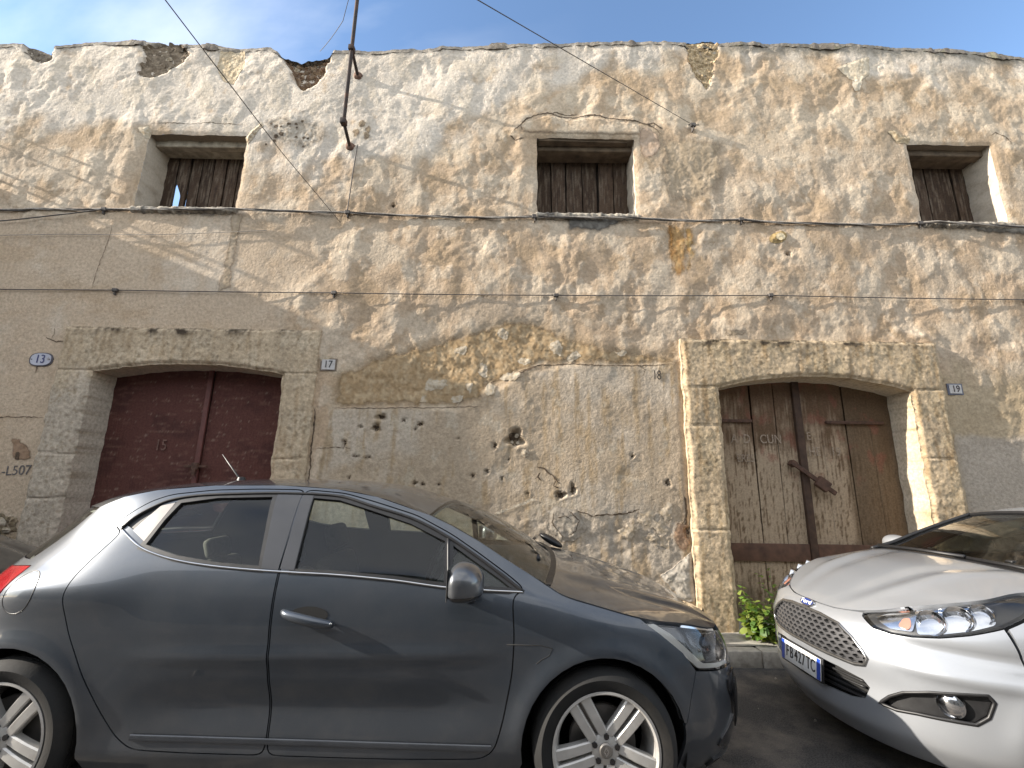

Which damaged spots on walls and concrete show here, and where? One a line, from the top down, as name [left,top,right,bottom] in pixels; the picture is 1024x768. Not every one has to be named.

spalling [137,44,190,78]
spalling [277,51,331,91]
spalling [686,42,719,89]
crack [510,112,662,140]
spalling [336,323,672,406]
crack [537,467,560,488]
crack [578,509,640,517]